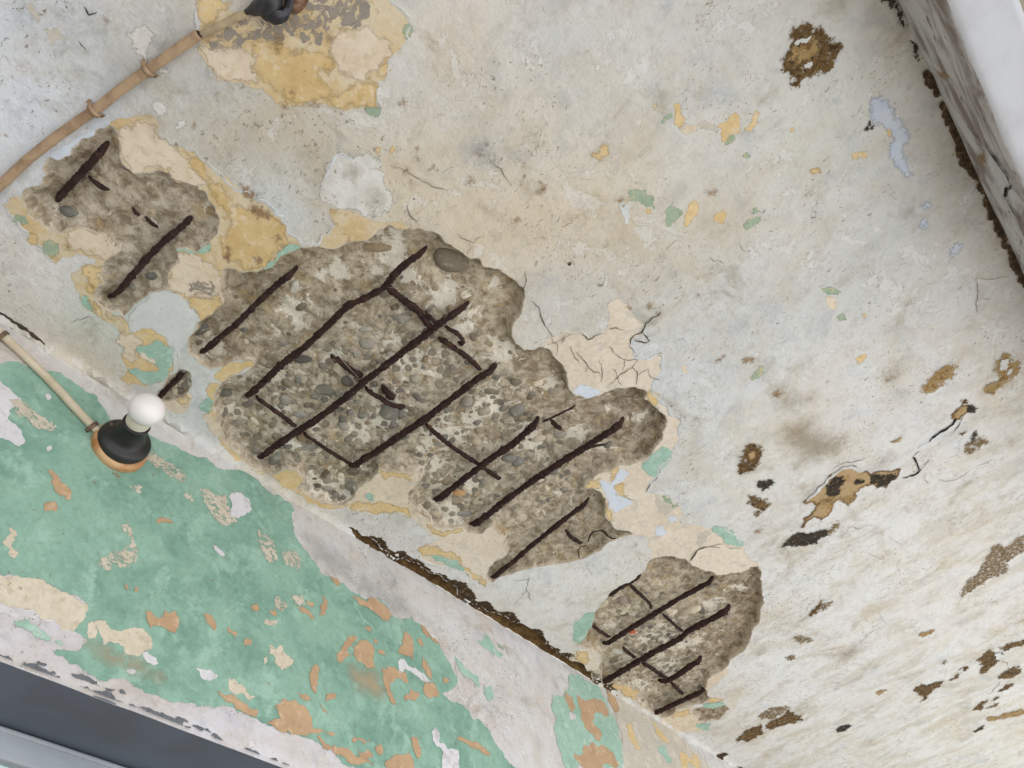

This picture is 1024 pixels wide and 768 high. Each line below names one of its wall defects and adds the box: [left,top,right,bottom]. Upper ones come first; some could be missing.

peeling [126,25,154,60]
peeling [194,0,413,118]
rust [88,175,110,191]
peeling [869,96,912,177]
water stain [907,40,1024,288]
crack [522,276,661,385]
spalling [0,98,765,768]